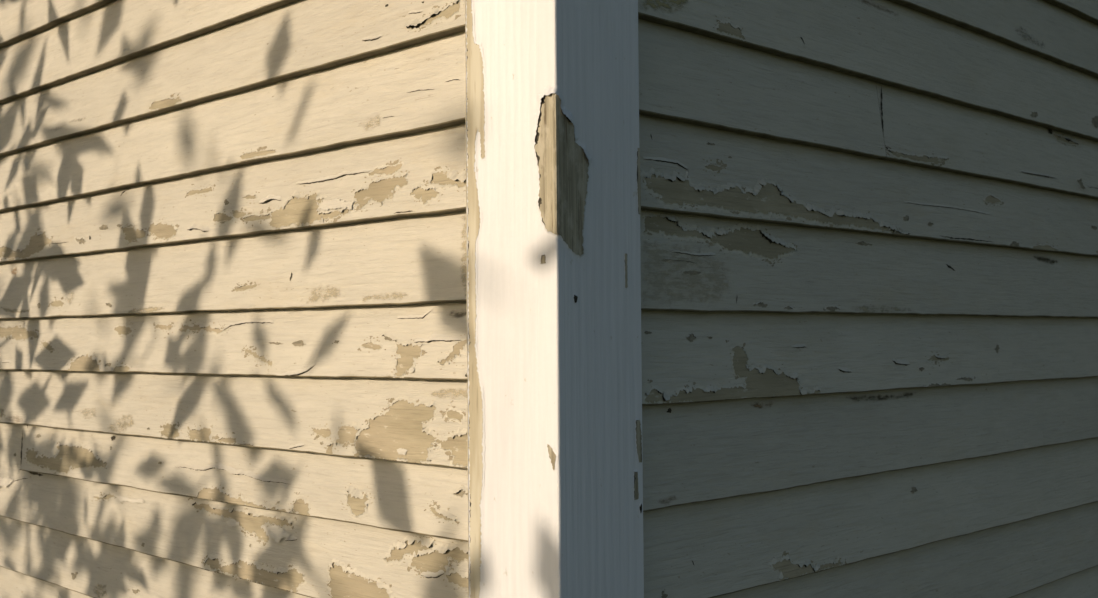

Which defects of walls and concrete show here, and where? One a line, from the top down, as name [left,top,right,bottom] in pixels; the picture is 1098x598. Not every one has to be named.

crack [881,86,893,153]
peeling [0,228,53,261]
peeling [74,217,179,246]
peeling [185,184,216,199]
peeling [530,85,593,263]
peeling [636,147,909,267]
peeling [211,0,487,598]
peeling [642,340,821,414]
peeling [13,433,116,476]
peeling [633,418,643,514]
peeling [188,484,311,593]